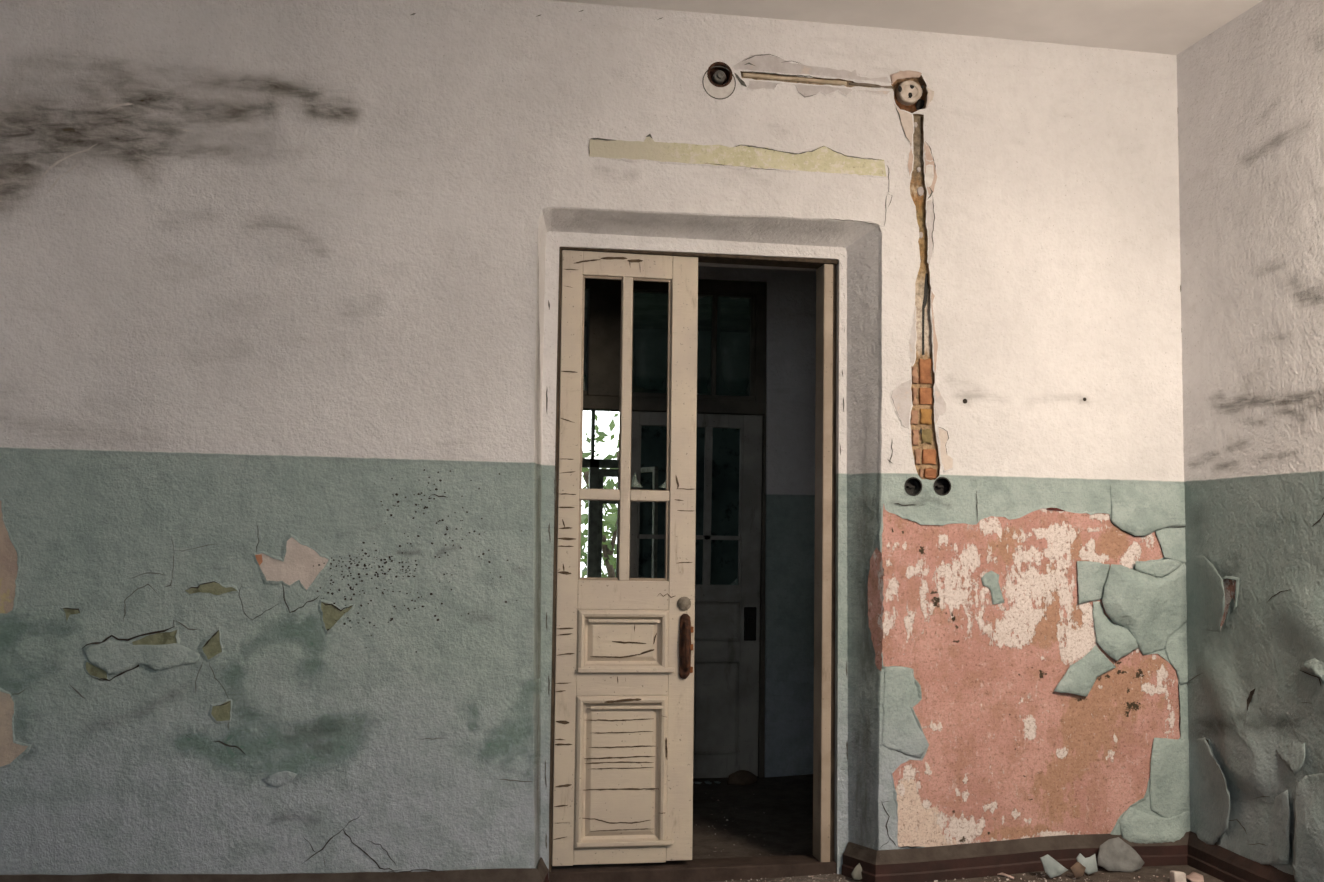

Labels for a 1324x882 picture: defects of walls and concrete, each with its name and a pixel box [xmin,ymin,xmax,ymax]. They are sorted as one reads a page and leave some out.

peeling [587,134,887,178]
peeling [733,53,938,265]
spalling [890,290,954,472]
peeling [0,498,21,617]
crack [123,537,214,622]
crack [239,584,319,620]
peeling [253,533,356,635]
peeling [1220,576,1240,633]
peeling [0,687,32,769]
crack [187,662,260,755]
peeling [867,491,1186,849]
crack [302,817,436,872]